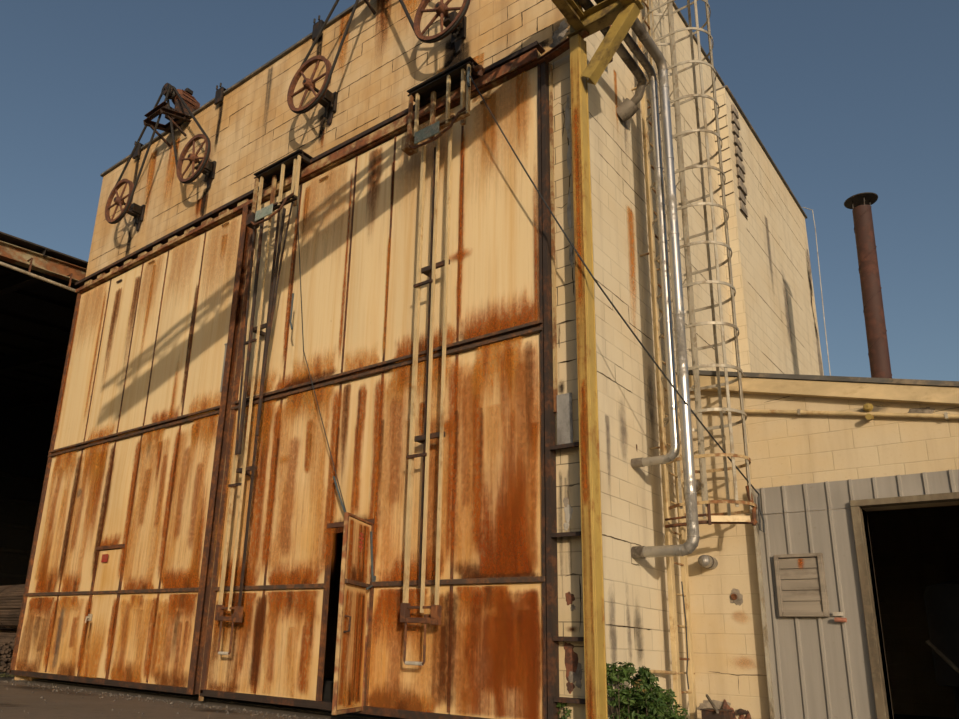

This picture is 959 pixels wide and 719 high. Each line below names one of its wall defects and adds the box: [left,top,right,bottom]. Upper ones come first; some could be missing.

corrosion [16,286,221,687]
corrosion [207,135,541,719]
spalling [565,592,576,611]
spalling [563,642,582,694]